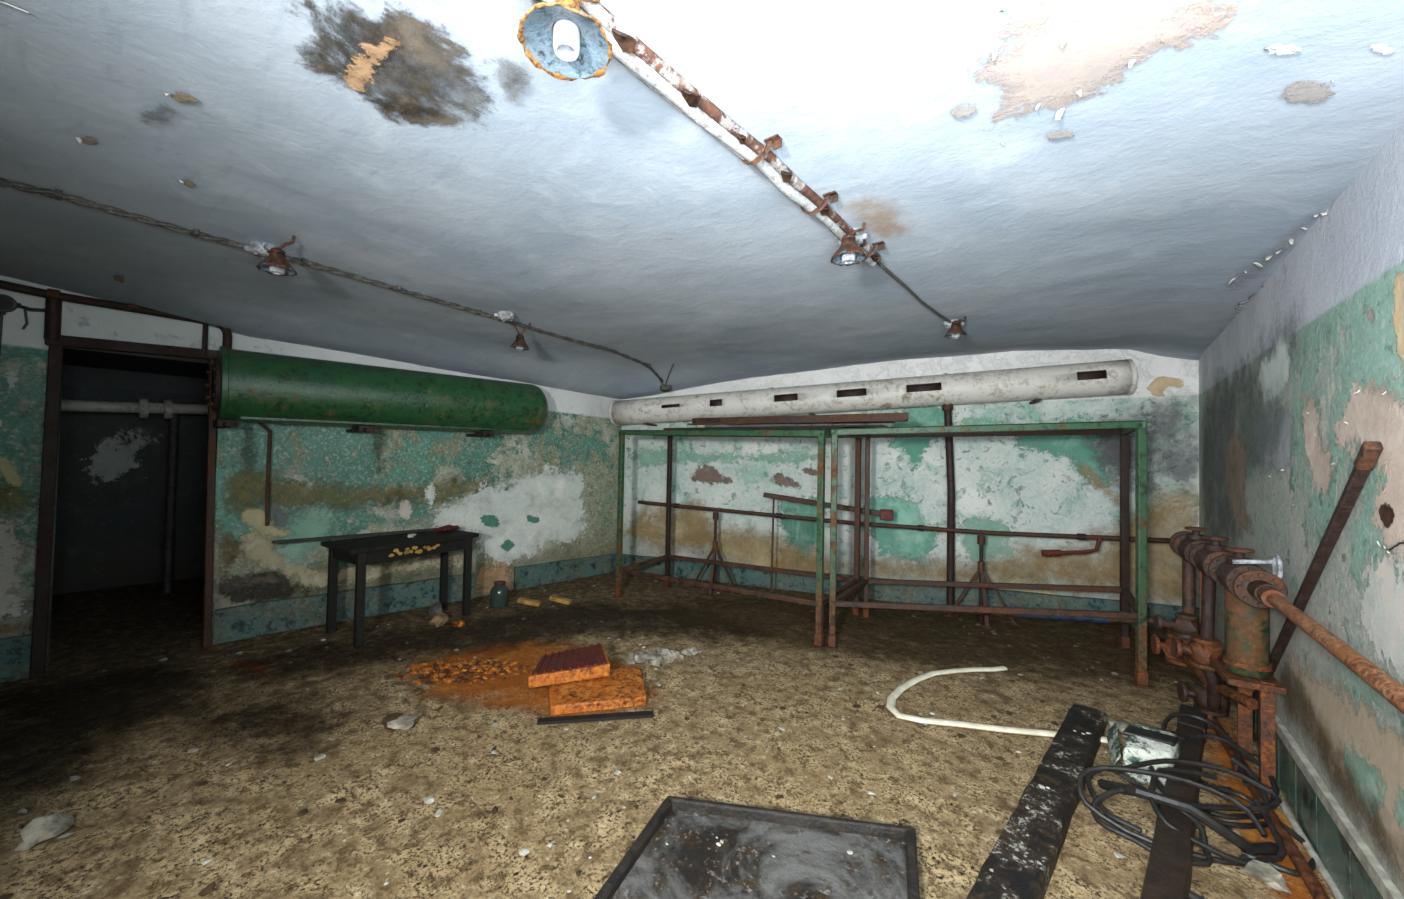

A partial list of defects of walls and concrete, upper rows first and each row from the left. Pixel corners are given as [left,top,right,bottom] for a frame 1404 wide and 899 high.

damp [291,0,528,127]
peeling [950,0,1243,147]
peeling [1147,376,1184,397]
flaking render [691,464,739,484]
flaking render [1225,271,1404,685]